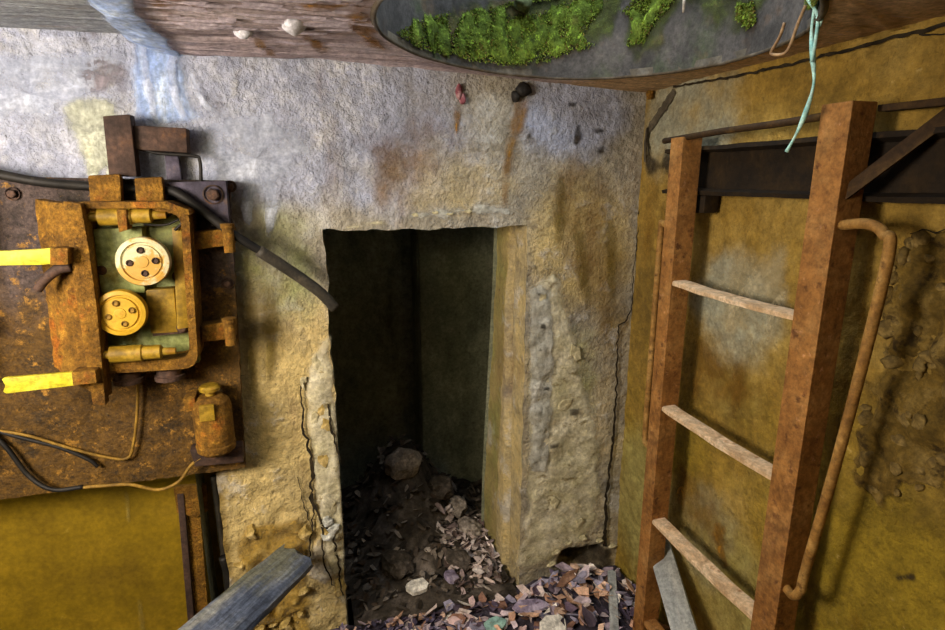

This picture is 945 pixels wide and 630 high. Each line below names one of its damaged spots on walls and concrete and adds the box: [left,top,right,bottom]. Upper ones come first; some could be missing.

water stain [0,57,114,176]
water stain [88,0,211,122]
crack [602,209,640,547]
spalling [854,230,945,506]
crack [297,385,344,596]